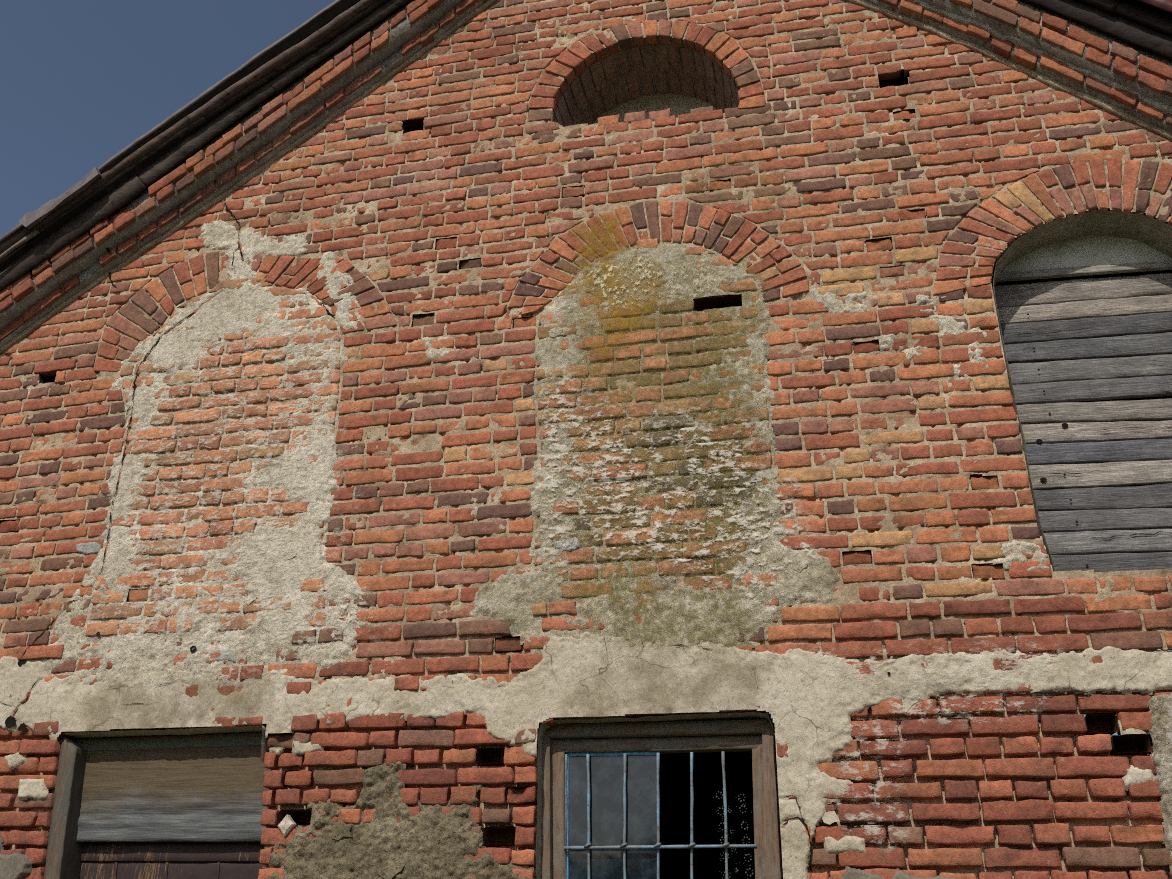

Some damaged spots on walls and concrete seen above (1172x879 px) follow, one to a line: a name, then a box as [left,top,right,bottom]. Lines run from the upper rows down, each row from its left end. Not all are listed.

crack [225,199,243,264]
spalling [898,208,926,221]
crack [3,295,216,715]
peeling [0,237,1172,879]
damp [541,376,811,603]